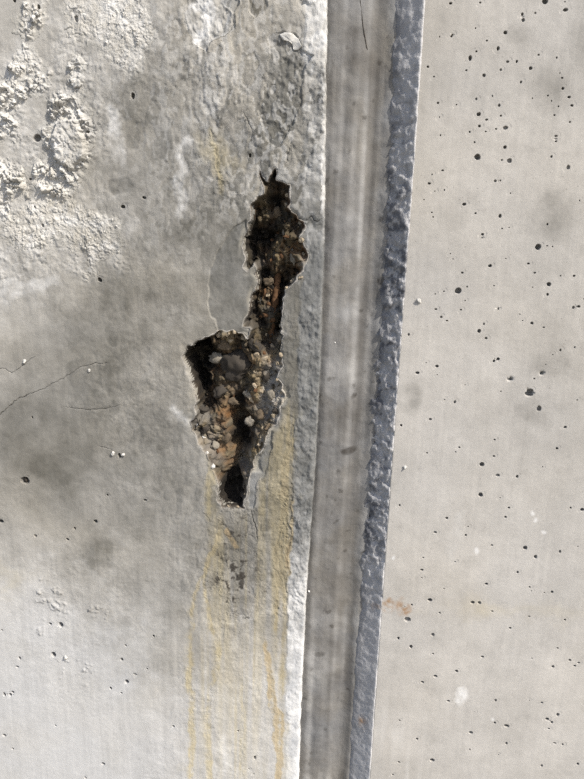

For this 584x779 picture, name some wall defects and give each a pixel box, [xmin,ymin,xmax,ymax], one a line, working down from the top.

flaking render [184,0,269,52]
spalling [0,0,157,283]
flaking render [257,30,315,148]
crack [0,361,110,418]
crack [65,403,122,412]
spalling [181,167,309,510]
rust [176,394,305,779]